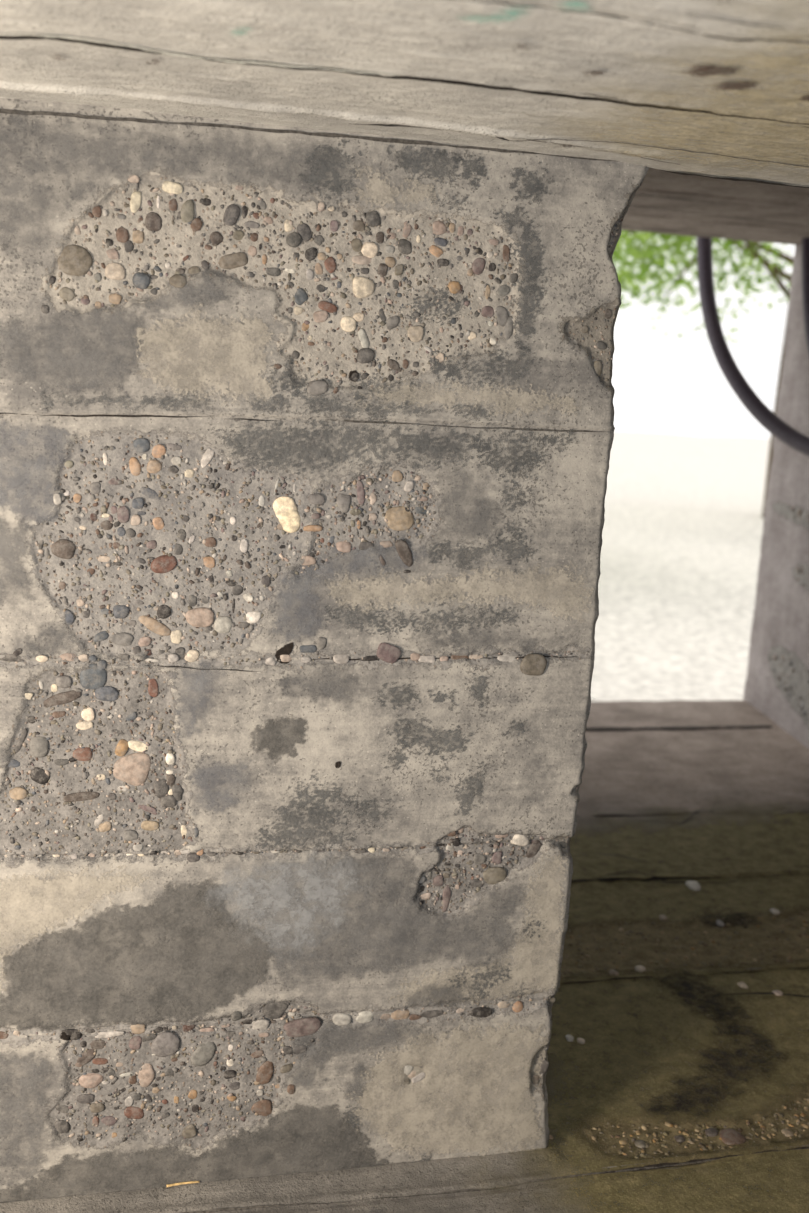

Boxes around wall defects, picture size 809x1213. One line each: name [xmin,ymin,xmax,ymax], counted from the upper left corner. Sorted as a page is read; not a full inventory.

crack [0,34,809,128]
crack [0,109,809,188]
spalling [0,139,578,866]
spalling [371,667,575,925]
water stain [0,857,523,1032]
spalling [42,997,327,1153]